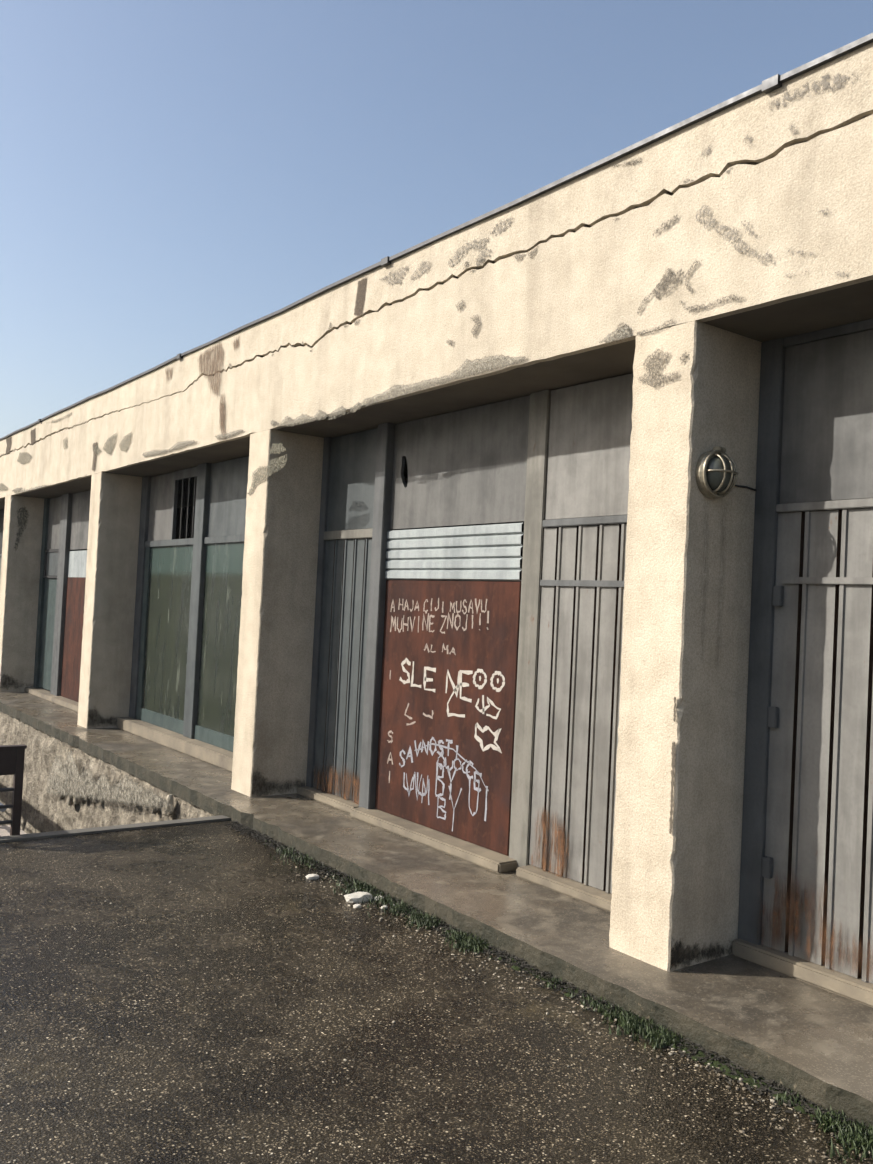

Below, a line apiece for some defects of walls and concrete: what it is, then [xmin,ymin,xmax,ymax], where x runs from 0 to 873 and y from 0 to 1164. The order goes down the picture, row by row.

peeling [379,262,430,285]
peeling [448,218,513,267]
crack [205,162,759,376]
peeling [637,260,744,313]
peeling [696,205,772,263]
spalling [599,320,673,343]
spalling [271,354,529,426]
peeling [639,349,687,387]
crack [92,417,102,471]
rust [762,881,873,969]